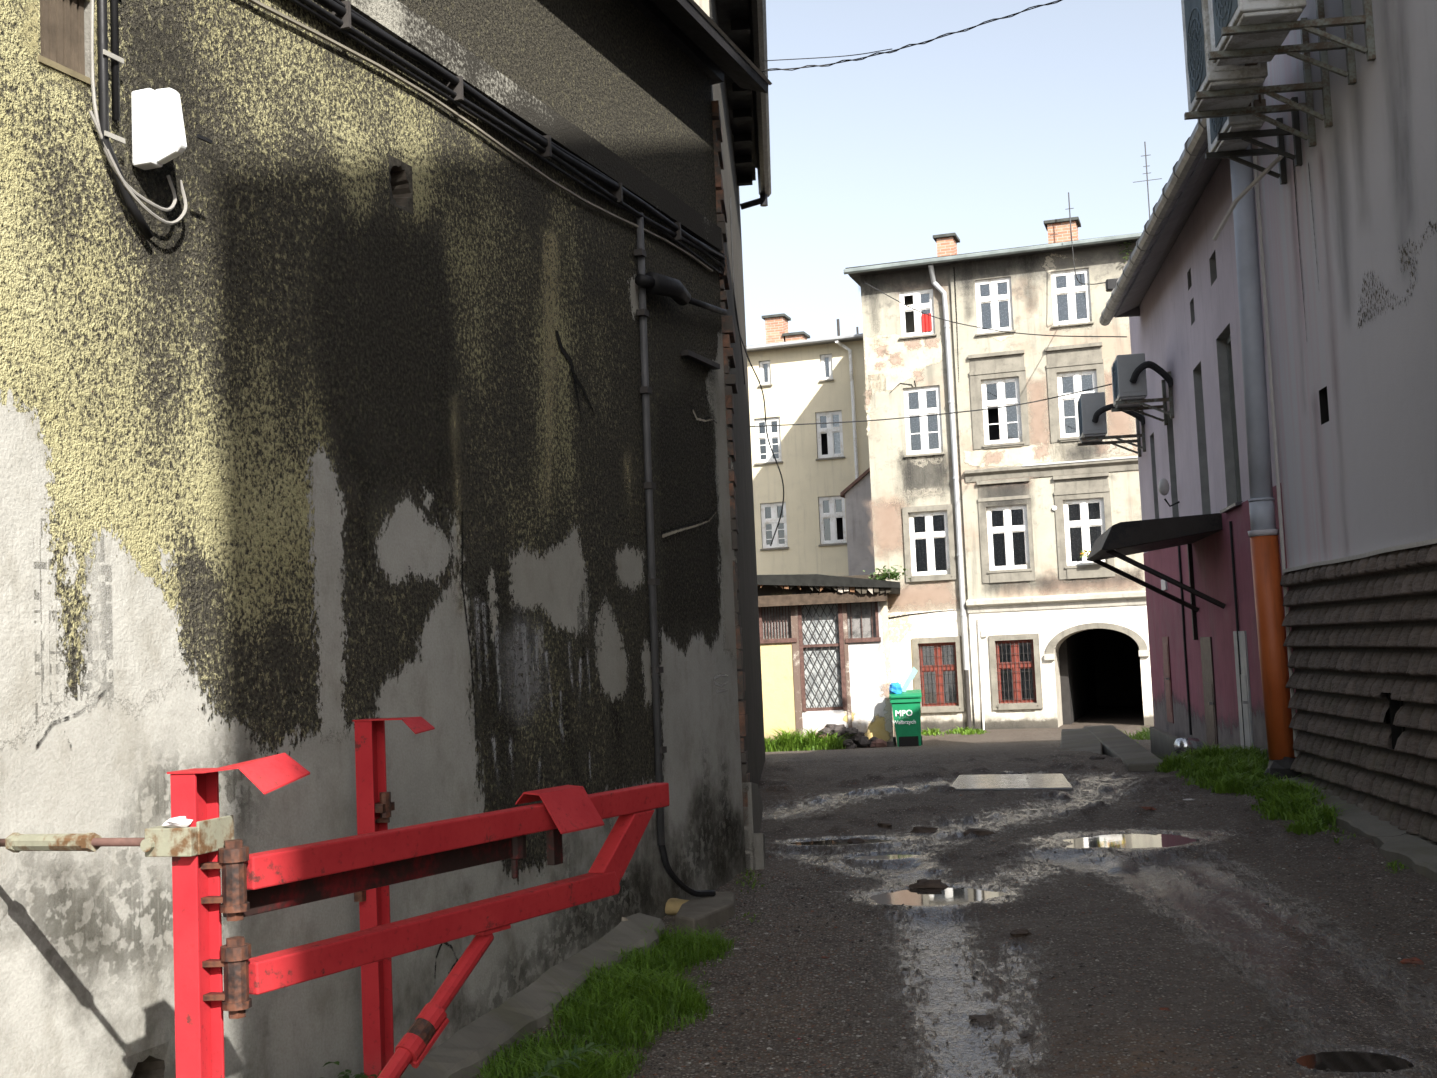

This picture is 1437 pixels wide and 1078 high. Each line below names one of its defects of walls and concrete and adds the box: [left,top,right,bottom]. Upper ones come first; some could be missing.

water stain [544,233,558,485]
flaking render [864,333,945,435]
flaking render [1358,221,1436,329]
flaking render [0,389,191,749]
flaking render [305,442,350,744]
flaking render [371,486,462,606]
water stain [476,603,590,712]
flaking render [486,523,652,711]